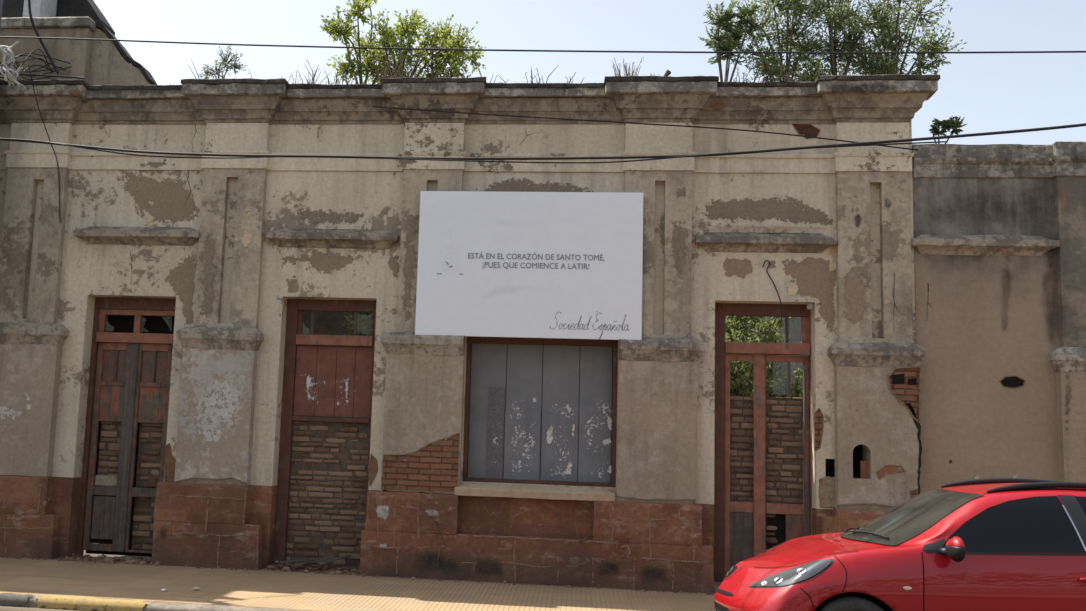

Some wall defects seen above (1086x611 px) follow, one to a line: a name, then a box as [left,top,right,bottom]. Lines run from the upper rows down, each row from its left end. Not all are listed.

peeling [112,158,201,224]
peeling [300,208,364,226]
peeling [705,194,836,227]
peeling [158,232,219,327]
peeling [723,258,753,279]
peeling [768,237,869,331]
peeling [306,375,355,409]
flaking render [886,366,922,424]
flaking render [368,432,460,493]
peeling [492,398,612,478]